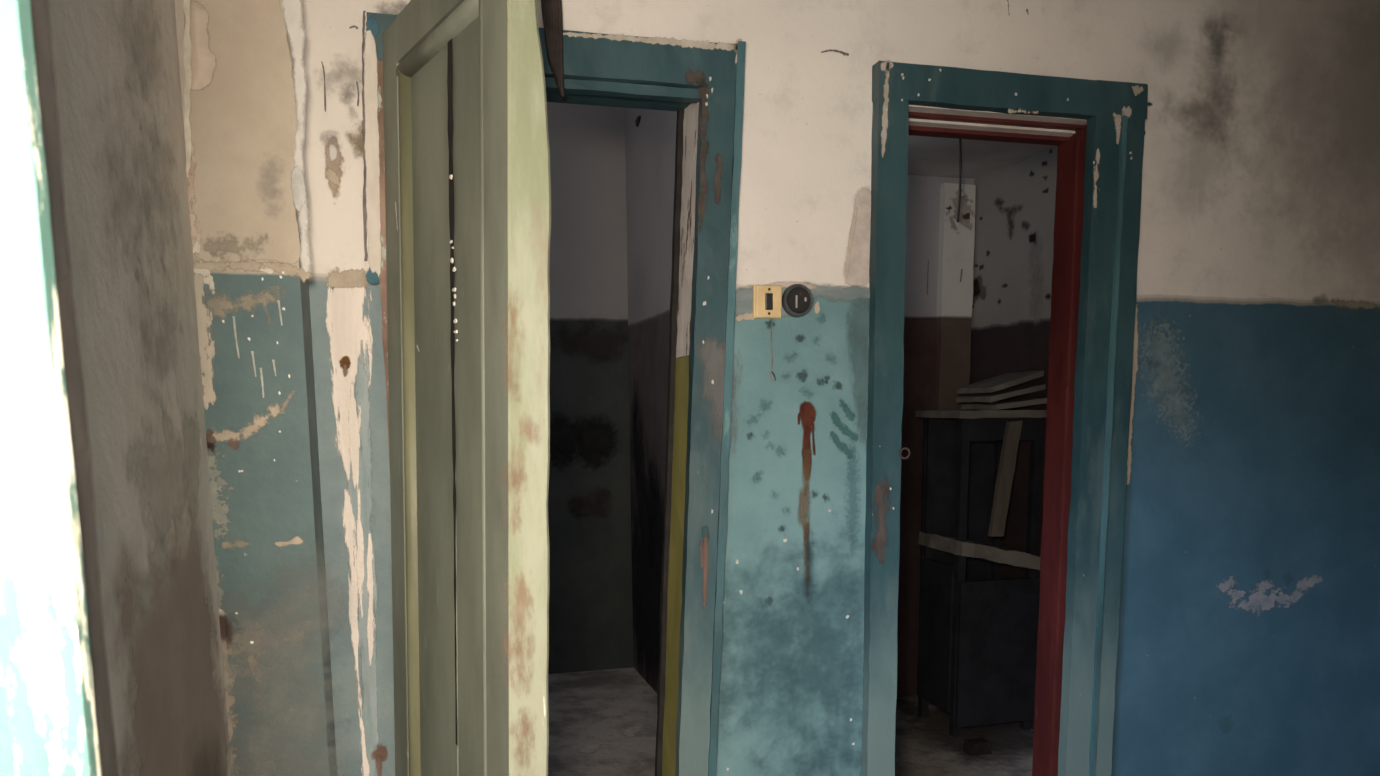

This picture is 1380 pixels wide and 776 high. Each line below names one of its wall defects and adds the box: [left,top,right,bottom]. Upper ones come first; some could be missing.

flaking render [184,0,381,776]
corrosion [798,402,816,582]
water stain [118,527,336,776]
water stain [747,543,858,705]
peeling [1216,574,1323,617]
corrosion [372,745,387,776]